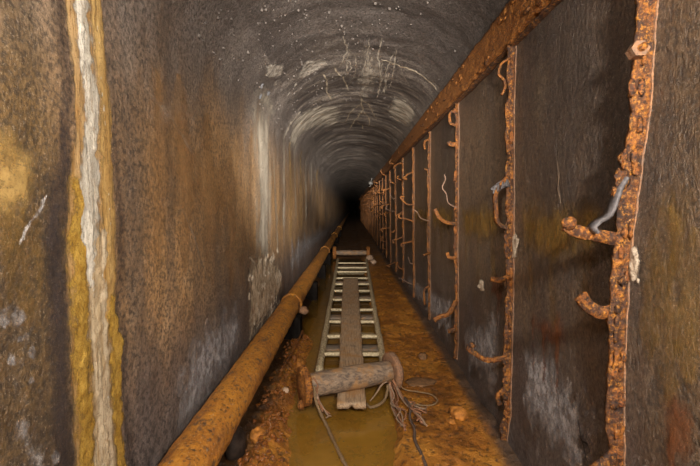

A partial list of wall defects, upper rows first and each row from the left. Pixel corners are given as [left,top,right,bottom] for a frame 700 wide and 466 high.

crack [383,60,437,90]
rust [628,78,646,97]
crack [345,96,377,130]
rust [628,115,643,133]
water stain [248,59,353,341]
water stain [47,0,127,466]
rust [611,346,627,379]
water stain [527,362,579,455]